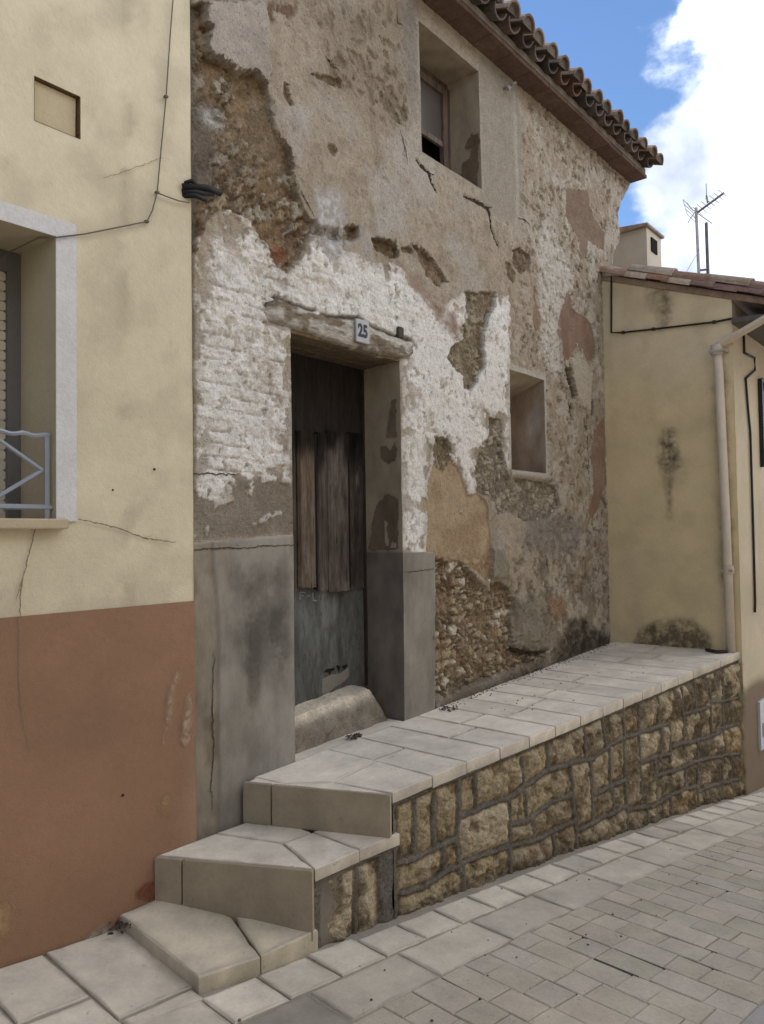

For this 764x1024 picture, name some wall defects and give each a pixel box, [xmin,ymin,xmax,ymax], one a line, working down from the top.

spalling [190,0,449,288]
crack [400,131,436,192]
crack [463,196,498,246]
spalling [447,290,498,390]
peeling [558,292,596,416]
crack [78,519,295,551]
peeling [368,493,399,551]
peeling [425,417,562,582]
peeling [588,401,607,519]
crack [16,529,36,750]
damp [637,620,710,649]
crack [208,653,216,811]